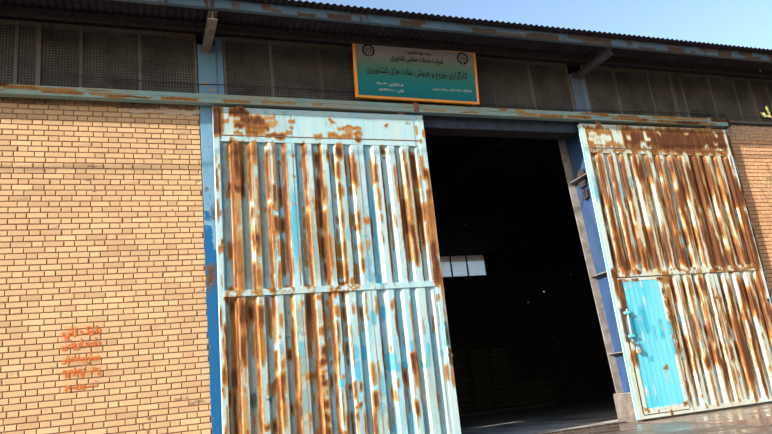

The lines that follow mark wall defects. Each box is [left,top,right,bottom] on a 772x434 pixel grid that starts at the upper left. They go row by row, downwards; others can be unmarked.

corrosion [498,108,772,410]